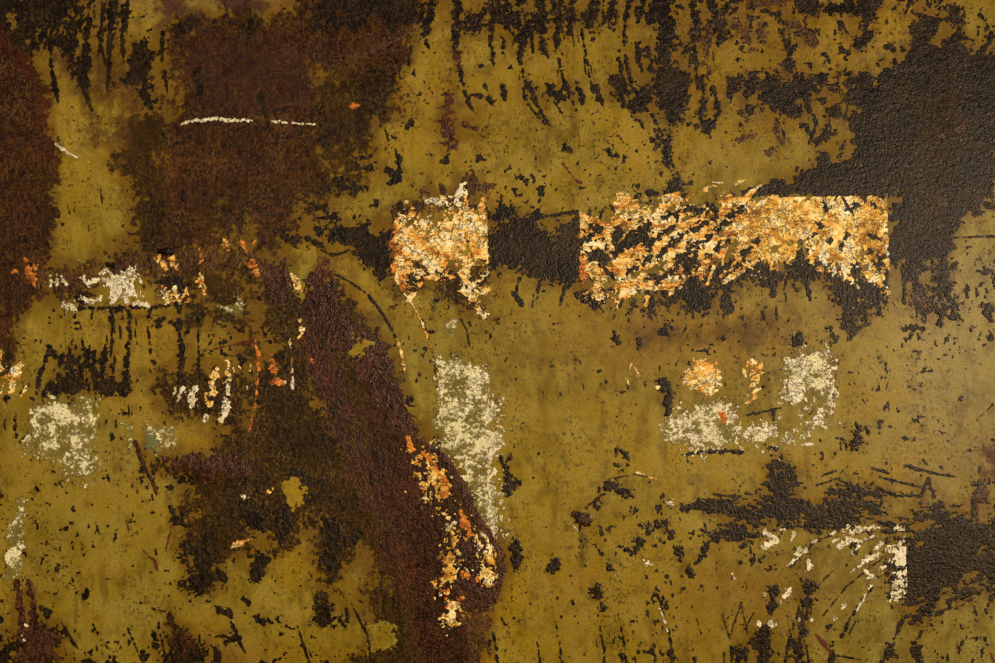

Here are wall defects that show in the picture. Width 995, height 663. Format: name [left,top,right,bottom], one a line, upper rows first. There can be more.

peeling [105,405,149,441]
peeling [251,309,365,455]
rust [256,256,507,663]
peeling [906,349,934,391]